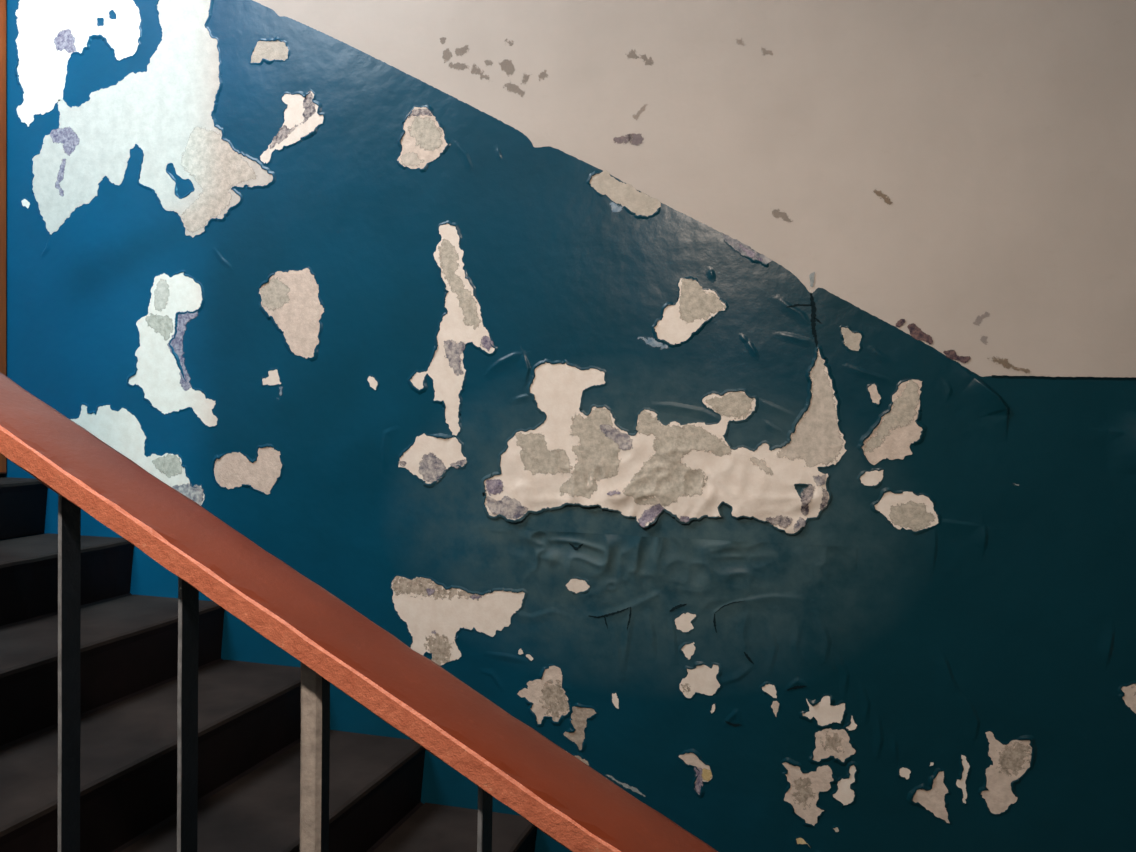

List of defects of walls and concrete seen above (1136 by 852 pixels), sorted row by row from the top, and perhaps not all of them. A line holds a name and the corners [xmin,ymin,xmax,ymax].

peeling [14,0,326,239]
peeling [126,270,219,429]
peeling [261,367,283,400]
peeling [258,266,325,362]
peeling [397,220,498,488]
peeling [638,276,729,349]
crack [787,293,821,348]
peeling [68,402,285,507]
peeling [481,345,942,535]
peeling [389,574,528,667]
peeling [780,693,860,849]
peeling [896,729,1037,825]